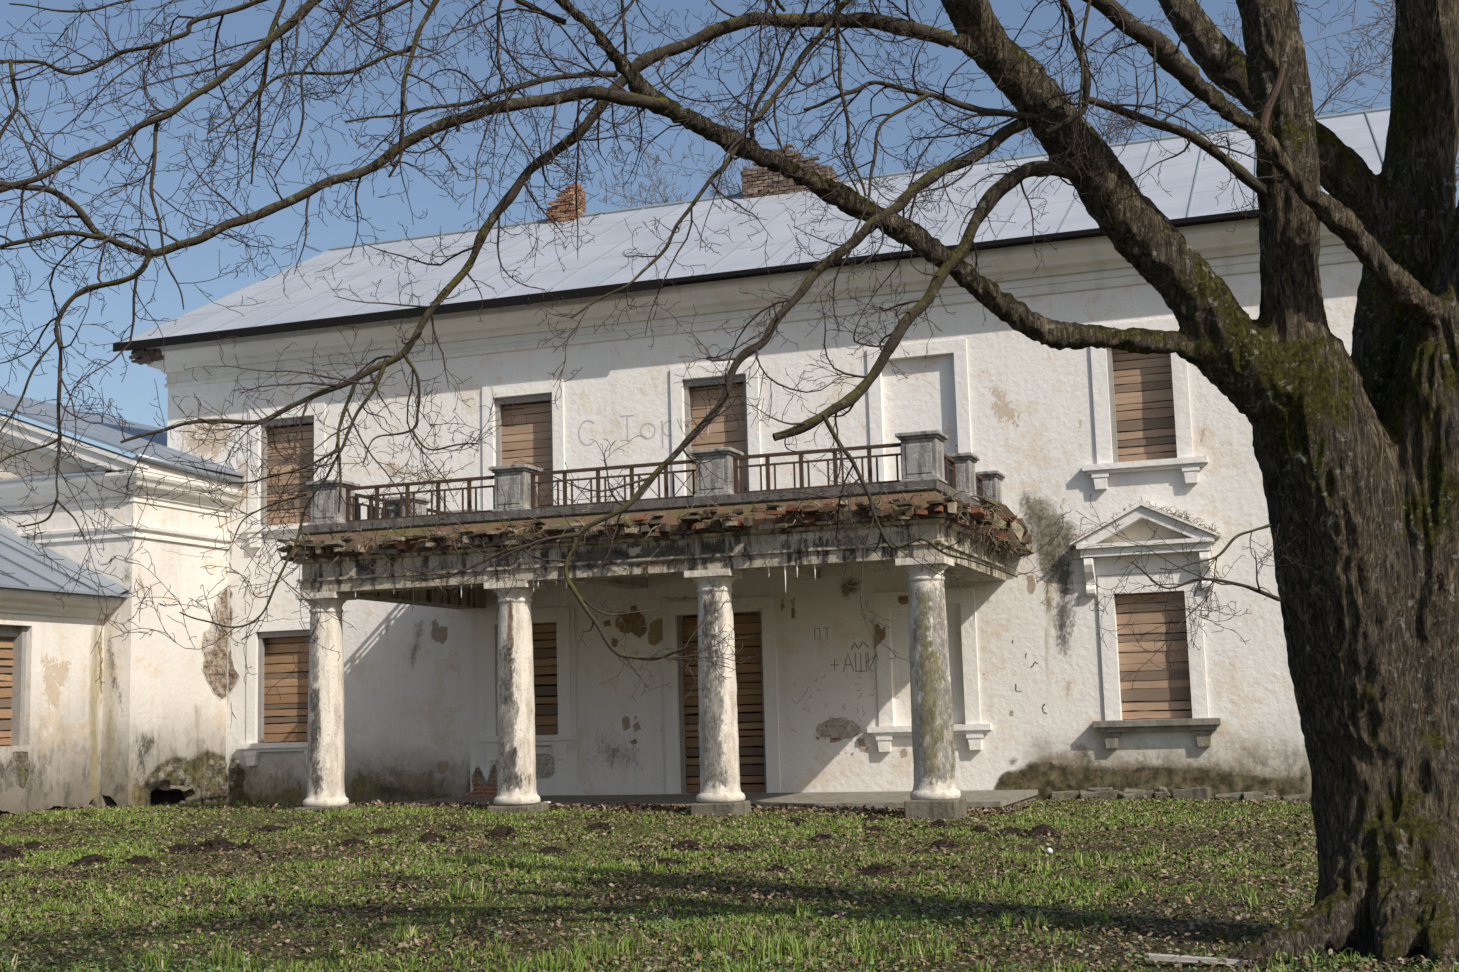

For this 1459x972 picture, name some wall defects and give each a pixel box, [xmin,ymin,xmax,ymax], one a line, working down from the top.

spalling [151,759,252,806]
flaking render [201,584,240,702]
flaking render [458,763,498,797]
leakage [499,599,532,790]
peeling [603,605,663,647]
leakage [563,538,728,788]
flaking render [814,717,868,754]
leakage [911,581,956,784]
leakage [1021,497,1076,654]